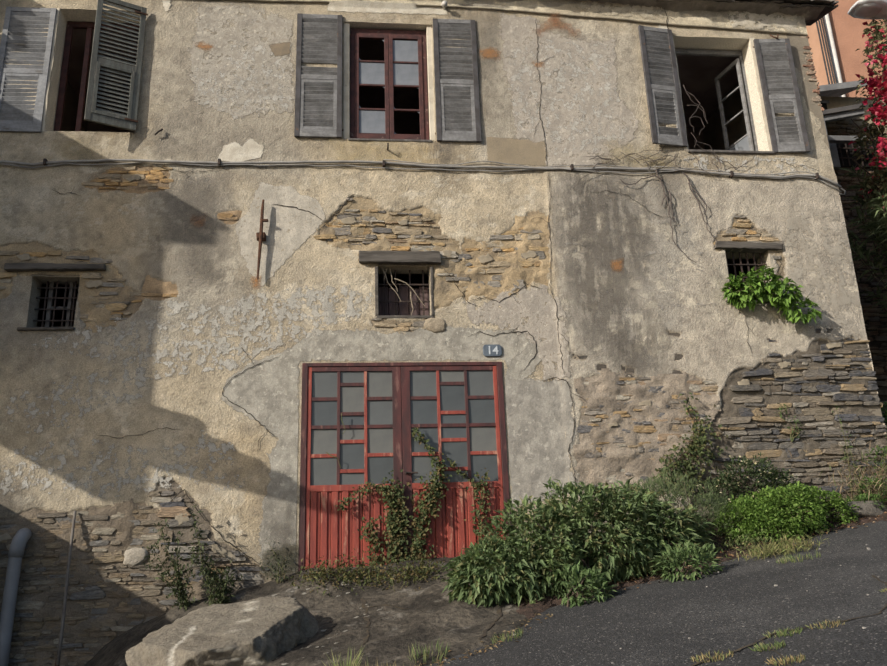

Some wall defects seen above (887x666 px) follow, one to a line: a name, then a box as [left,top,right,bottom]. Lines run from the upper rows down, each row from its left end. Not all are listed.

flaking render [81,165,174,194]
flaking render [0,241,373,380]
flaking render [217,210,242,225]
crack [222,344,276,453]
crack [446,19,587,483]
flaking render [313,197,887,509]
flaking render [0,430,269,666]